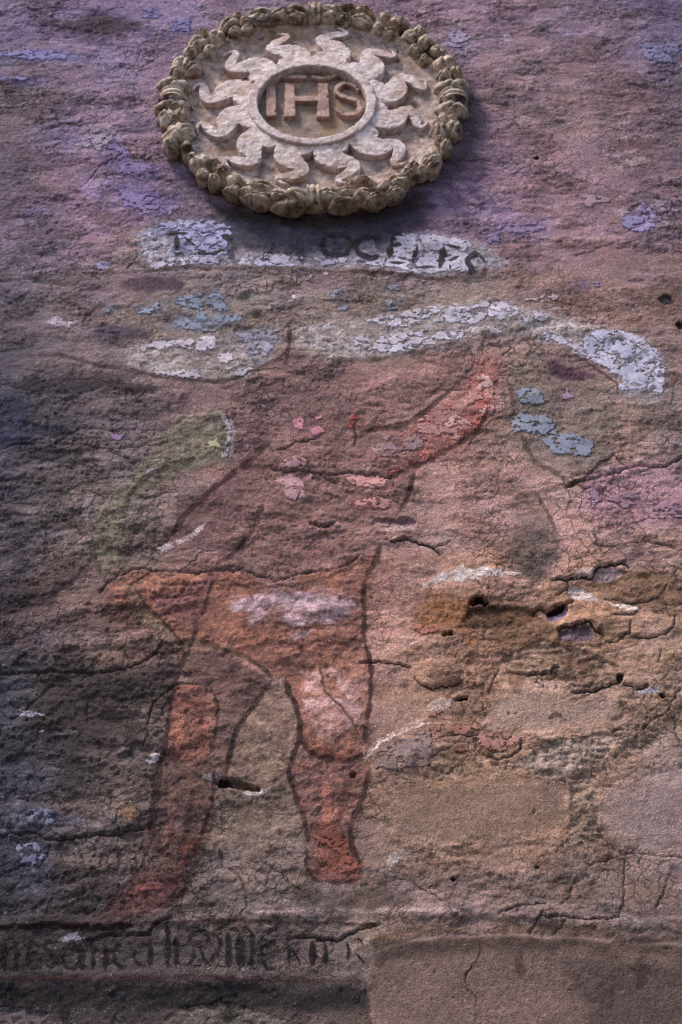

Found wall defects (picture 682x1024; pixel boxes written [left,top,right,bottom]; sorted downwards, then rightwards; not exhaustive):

crack [567,456,681,488]
crack [387,538,448,555]
spalling [456,567,640,690]
peeling [374,710,520,770]
spalling [520,732,622,852]
crack [499,832,682,934]
crack [288,925,378,954]
crack [465,937,482,1022]